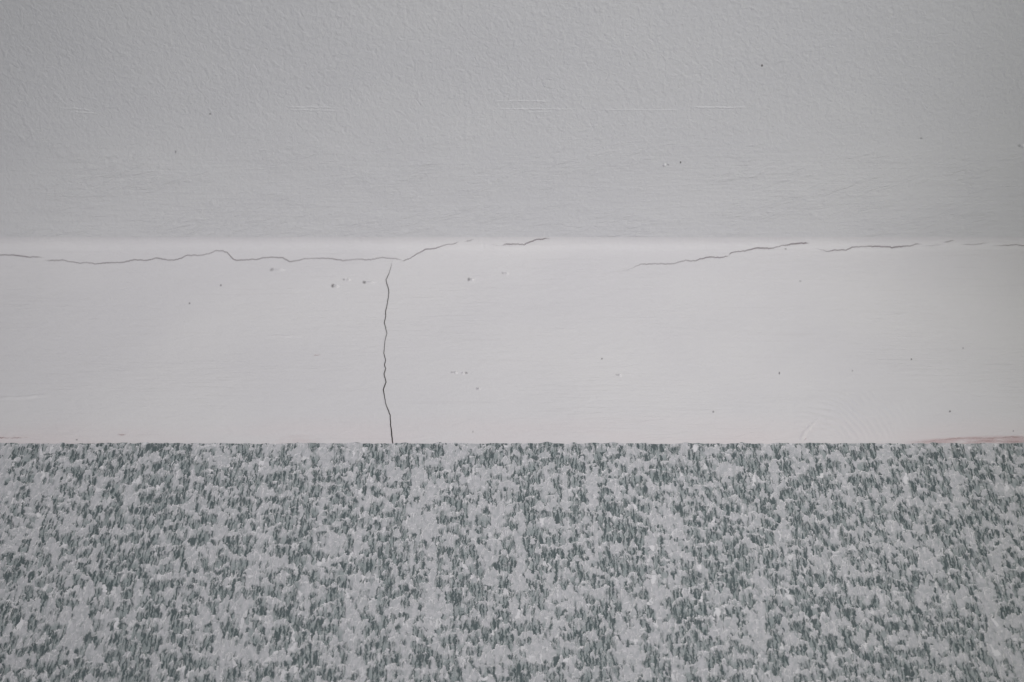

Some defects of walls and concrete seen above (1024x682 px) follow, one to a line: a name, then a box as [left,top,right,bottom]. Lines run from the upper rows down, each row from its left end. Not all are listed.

crack [0,239,551,443]
crack [611,241,955,273]